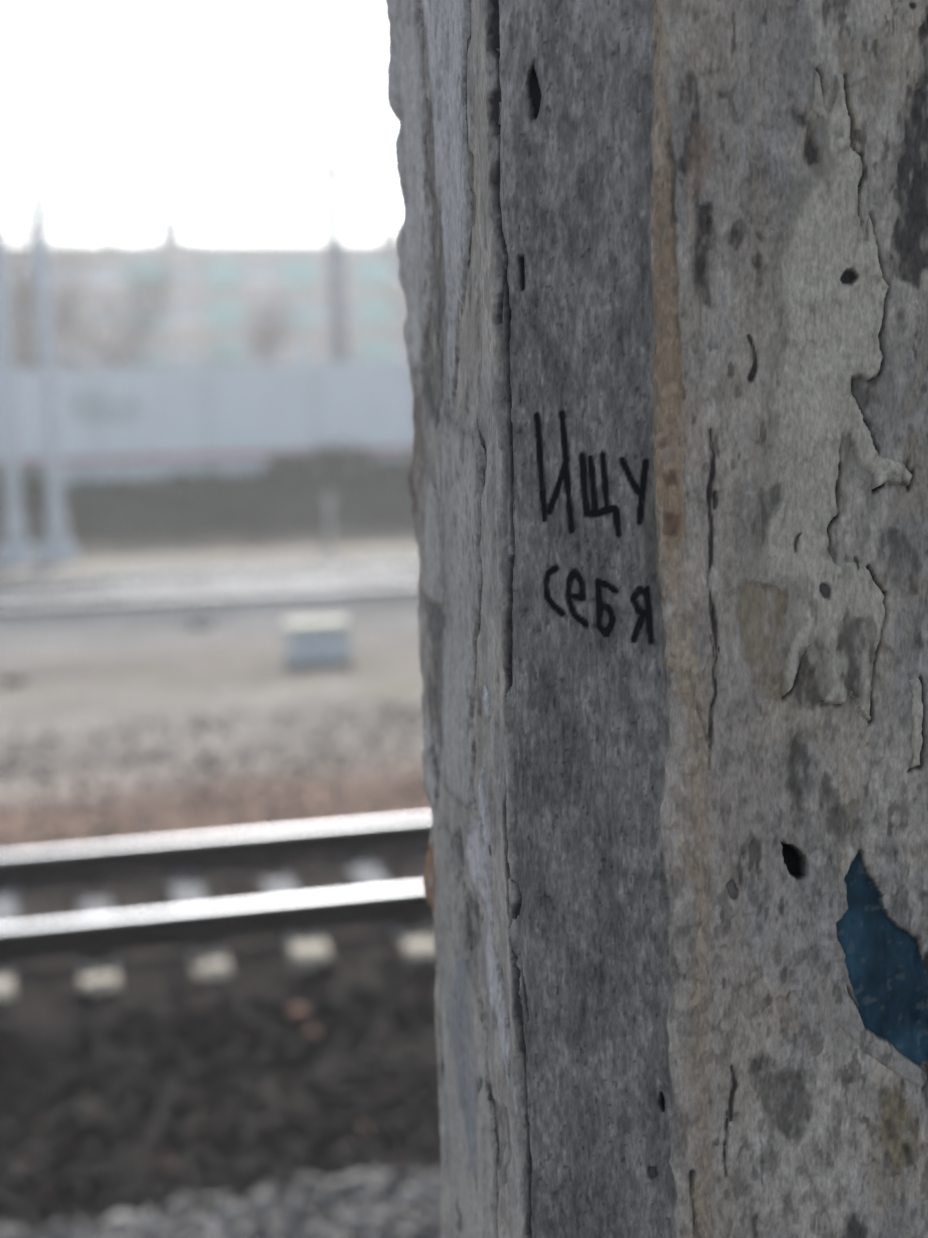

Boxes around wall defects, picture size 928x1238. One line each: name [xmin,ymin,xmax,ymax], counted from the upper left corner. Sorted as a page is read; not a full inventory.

spalling [894,12,928,286]
crack [466,0,515,692]
peeling [751,70,912,722]
peeling [909,678,923,768]
crack [488,1087,532,1238]
crack [505,802,529,1054]
peeling [836,989,928,1103]